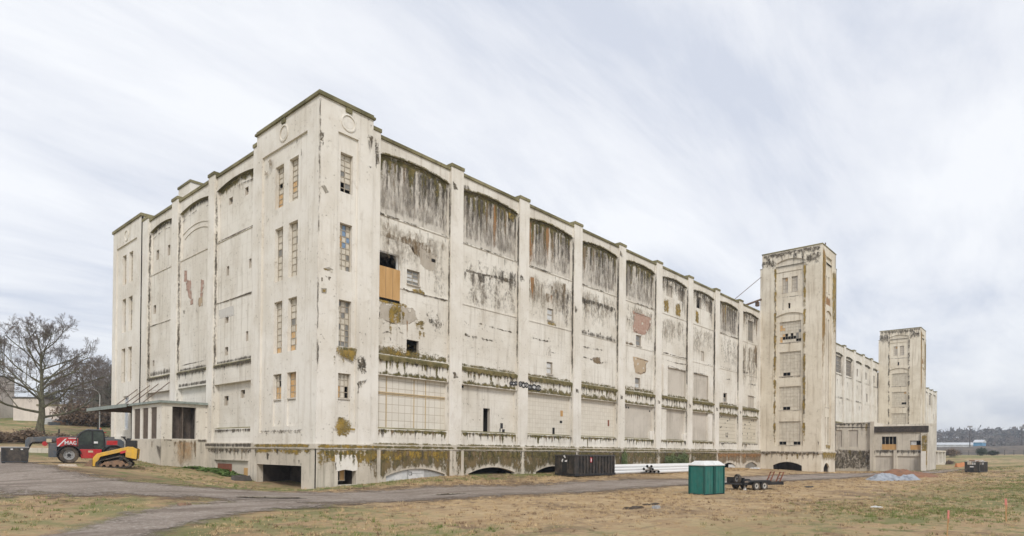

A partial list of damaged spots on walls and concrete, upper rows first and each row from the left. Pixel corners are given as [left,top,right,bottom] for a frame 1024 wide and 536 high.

leakage [369,136,450,259]
leakage [761,246,820,269]
spalling [183,270,204,313]
leakage [464,197,758,381]
flaking render [379,298,425,339]
spalling [633,311,651,335]
spalling [633,357,648,375]